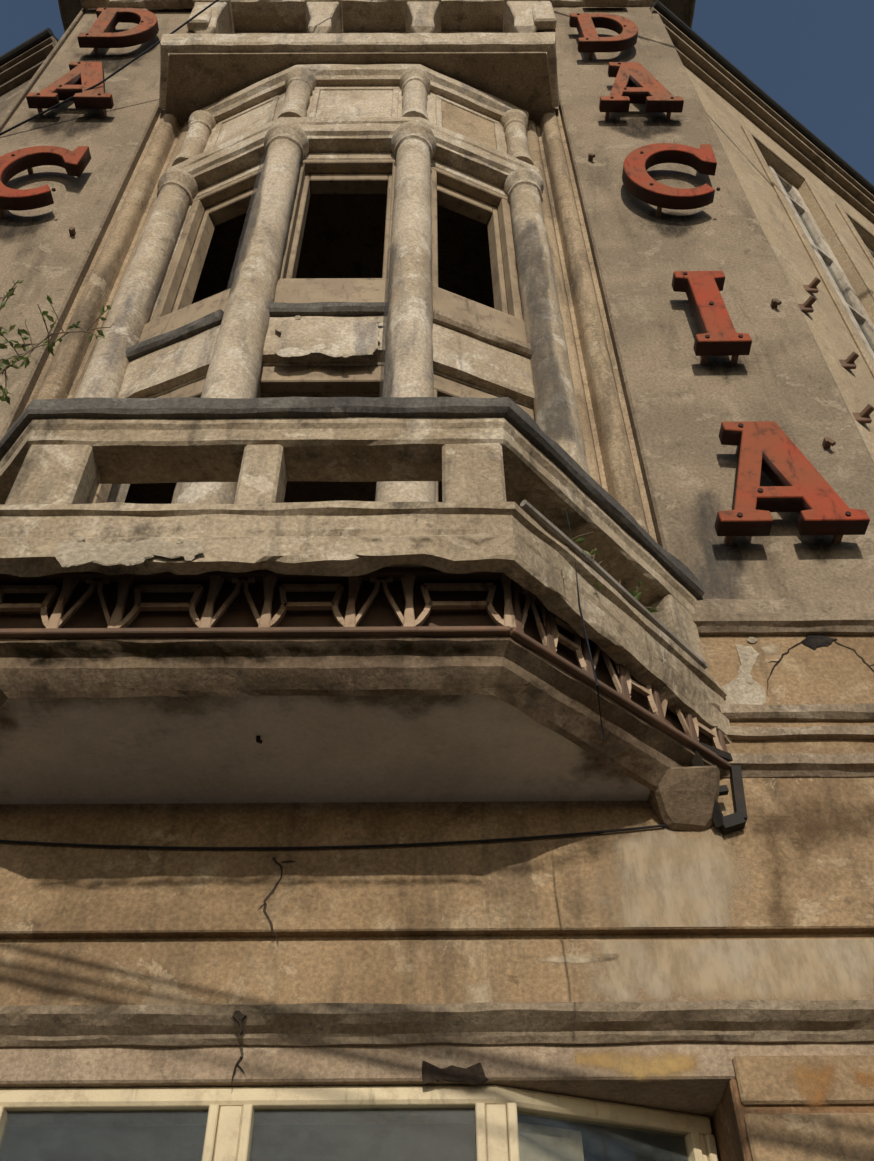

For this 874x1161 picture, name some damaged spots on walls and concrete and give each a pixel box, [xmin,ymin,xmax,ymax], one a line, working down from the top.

peeling [273,315,384,358]
peeling [55,536,205,567]
peeling [722,637,777,705]
crack [767,640,803,695]
crack [835,641,874,672]
crack [258,857,295,944]